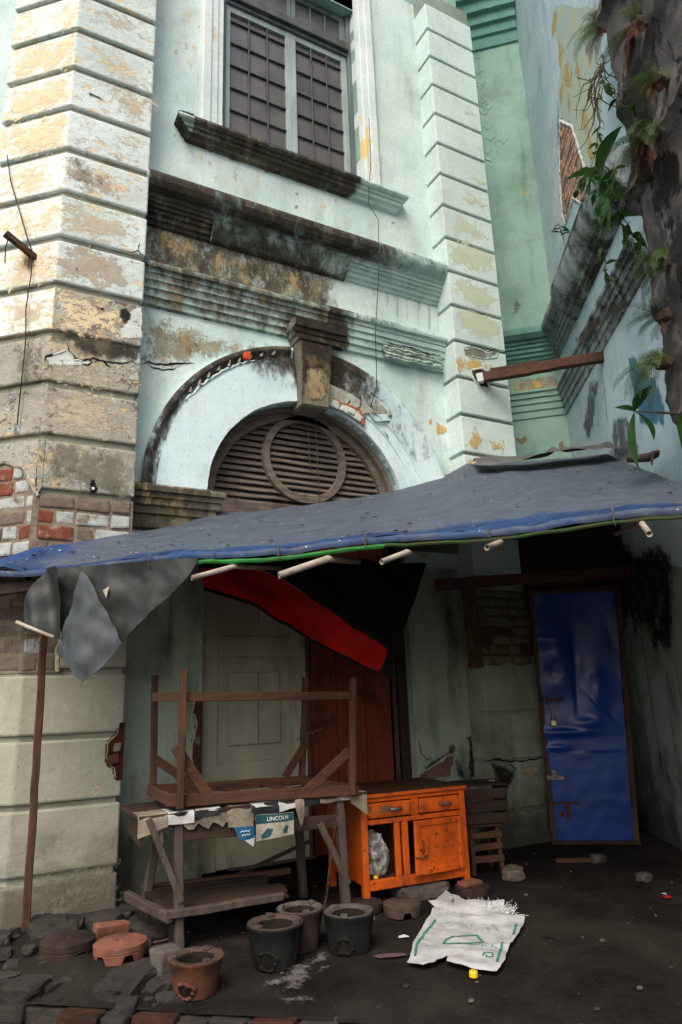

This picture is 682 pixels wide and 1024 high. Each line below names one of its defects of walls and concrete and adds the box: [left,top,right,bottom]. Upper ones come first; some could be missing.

flaking render [0,348,141,674]
peeling [3,5,143,340]
crack [44,342,191,371]
peeling [89,56,160,156]
water stain [132,169,440,531]
peeling [448,175,501,390]
peeling [466,427,527,464]
peeling [552,4,602,227]
water stain [542,164,647,353]
water stain [622,543,673,651]
crack [485,756,543,770]